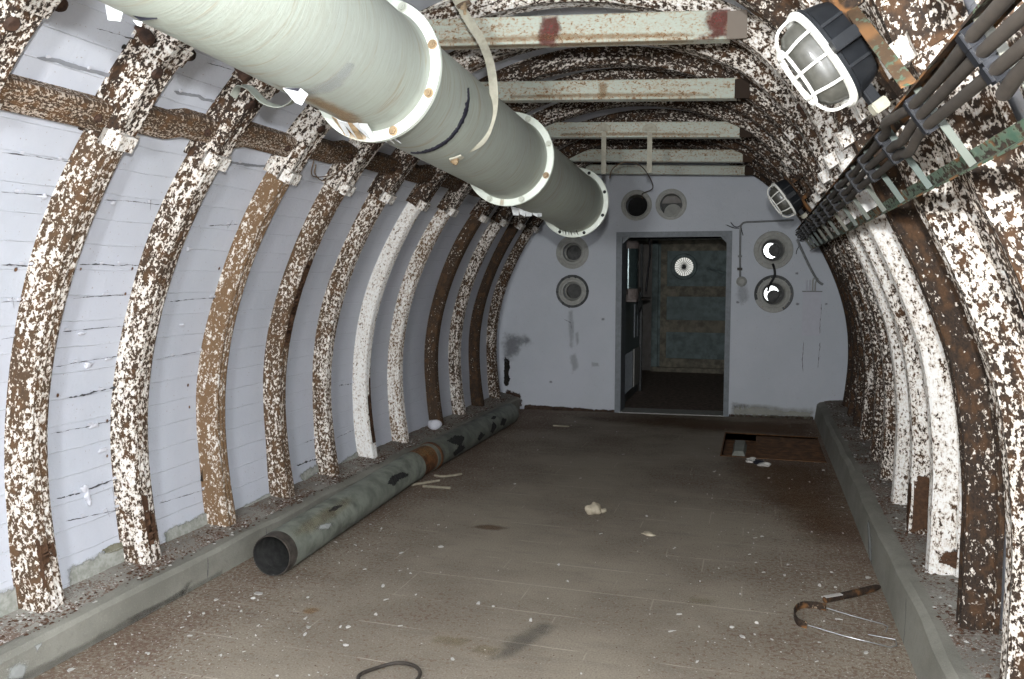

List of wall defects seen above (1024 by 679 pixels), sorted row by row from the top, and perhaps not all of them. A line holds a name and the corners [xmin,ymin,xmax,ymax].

rust [539,17,560,46]
rust [284,260,313,347]
rust [141,495,157,546]
rust [906,476,930,535]
rust [35,538,57,588]
rust [939,548,958,569]